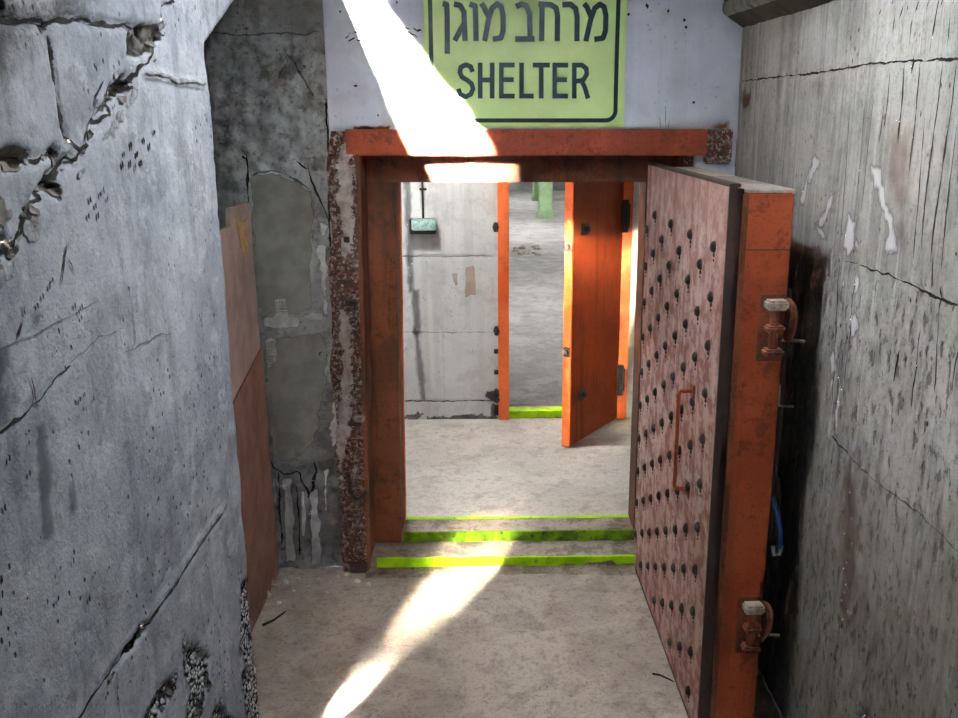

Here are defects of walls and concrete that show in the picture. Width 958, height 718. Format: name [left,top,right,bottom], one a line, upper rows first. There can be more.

crack [745,57,958,81]
crack [0,0,206,259]
leakage [800,156,819,204]
leakage [898,57,958,268]
crack [62,245,73,281]
leakage [815,77,897,441]
crack [845,259,958,308]
crack [0,365,71,434]
leakage [272,469,329,565]
crack [78,506,226,718]